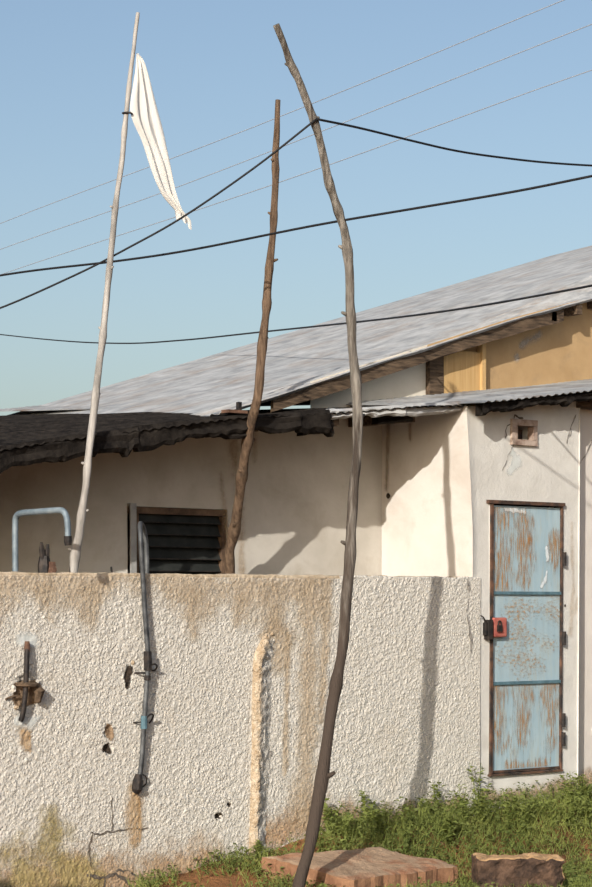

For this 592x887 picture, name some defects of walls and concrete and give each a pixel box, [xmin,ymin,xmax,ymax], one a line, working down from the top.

crack [502,414,524,471]
crack [567,415,592,458]
damp [0,575,121,602]
rust [494,507,534,591]
rust [21,726,30,752]
damp [145,577,331,822]
rust [493,599,560,769]
crack [87,797,148,887]